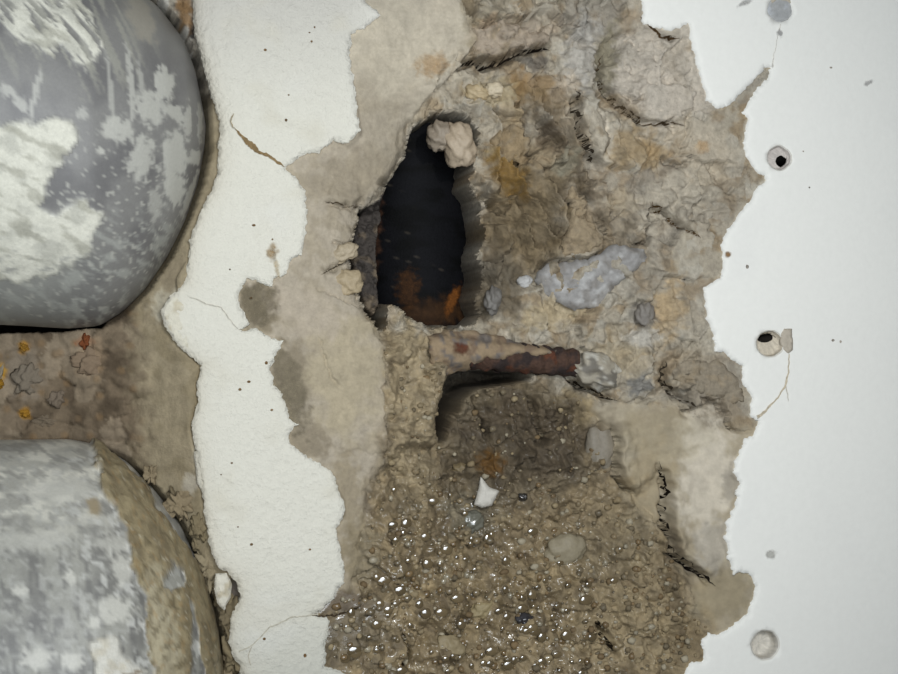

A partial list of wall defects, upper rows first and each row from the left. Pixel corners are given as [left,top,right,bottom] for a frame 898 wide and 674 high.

crack [641,17,680,41]
crack [455,47,548,71]
crack [569,54,684,163]
crack [230,113,284,167]
crack [632,202,701,245]
rust [399,272,465,325]
spalling [238,0,771,674]
crack [658,363,696,407]
crack [657,465,715,586]